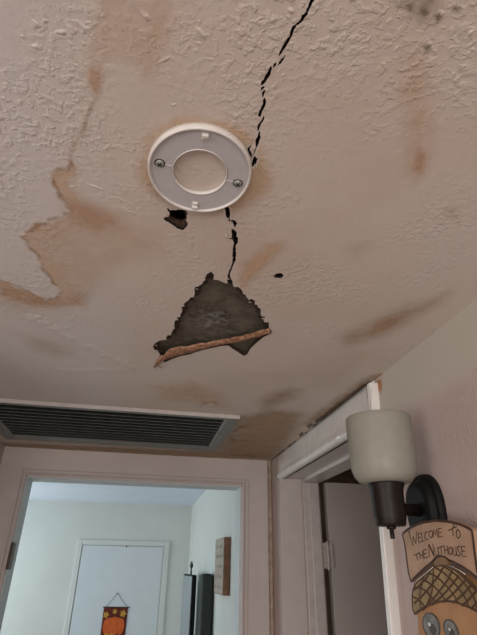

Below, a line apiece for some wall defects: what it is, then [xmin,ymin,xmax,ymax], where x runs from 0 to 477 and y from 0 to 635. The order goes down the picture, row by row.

crack [247,0,314,167]
spalling [162,208,188,230]
crack [225,207,238,284]
spalling [153,272,272,368]